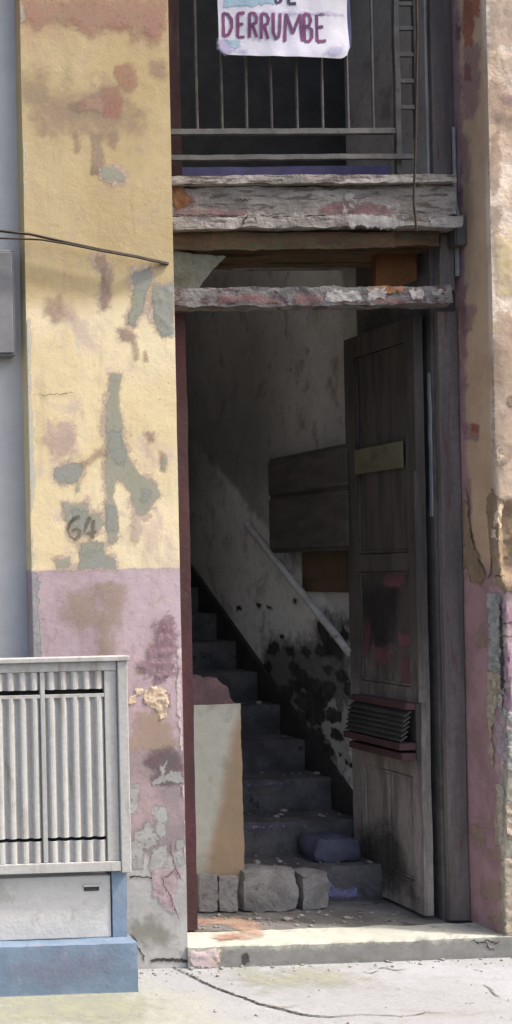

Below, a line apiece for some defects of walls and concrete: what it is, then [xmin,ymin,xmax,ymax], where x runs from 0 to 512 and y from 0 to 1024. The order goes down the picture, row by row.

peeling [91,132,128,187]
peeling [89,251,112,308]
flaking render [117,263,175,344]
peeling [325,286,443,302]
peeling [53,372,167,573]
peeling [128,614,183,752]
flaking render [485,488,512,934]
crack [130,841,183,919]
peeling [130,783,186,912]
crack [131,934,431,1017]